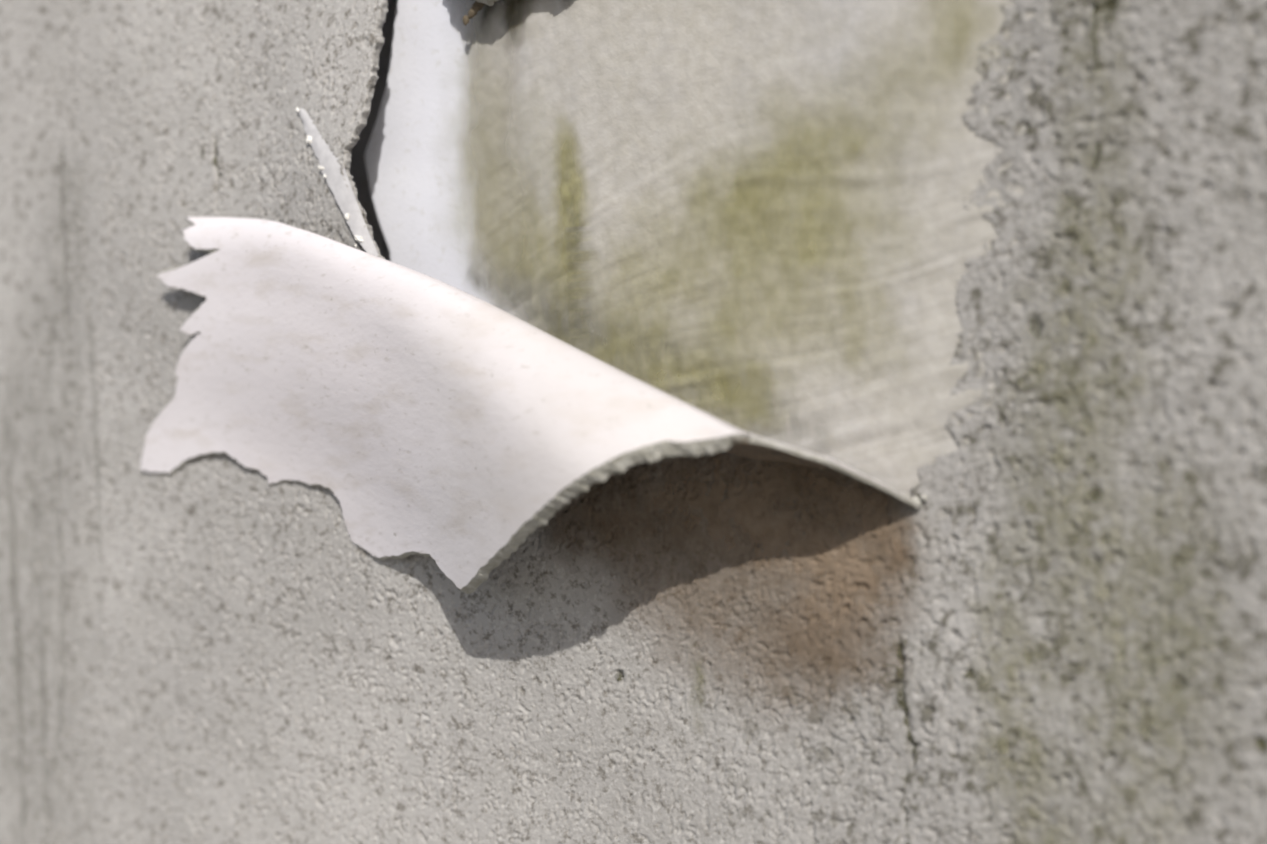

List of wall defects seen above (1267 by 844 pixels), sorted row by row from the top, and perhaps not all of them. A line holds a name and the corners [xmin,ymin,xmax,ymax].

peeling [140,0,928,594]
water stain [467,0,1024,665]
crack [886,637,917,844]